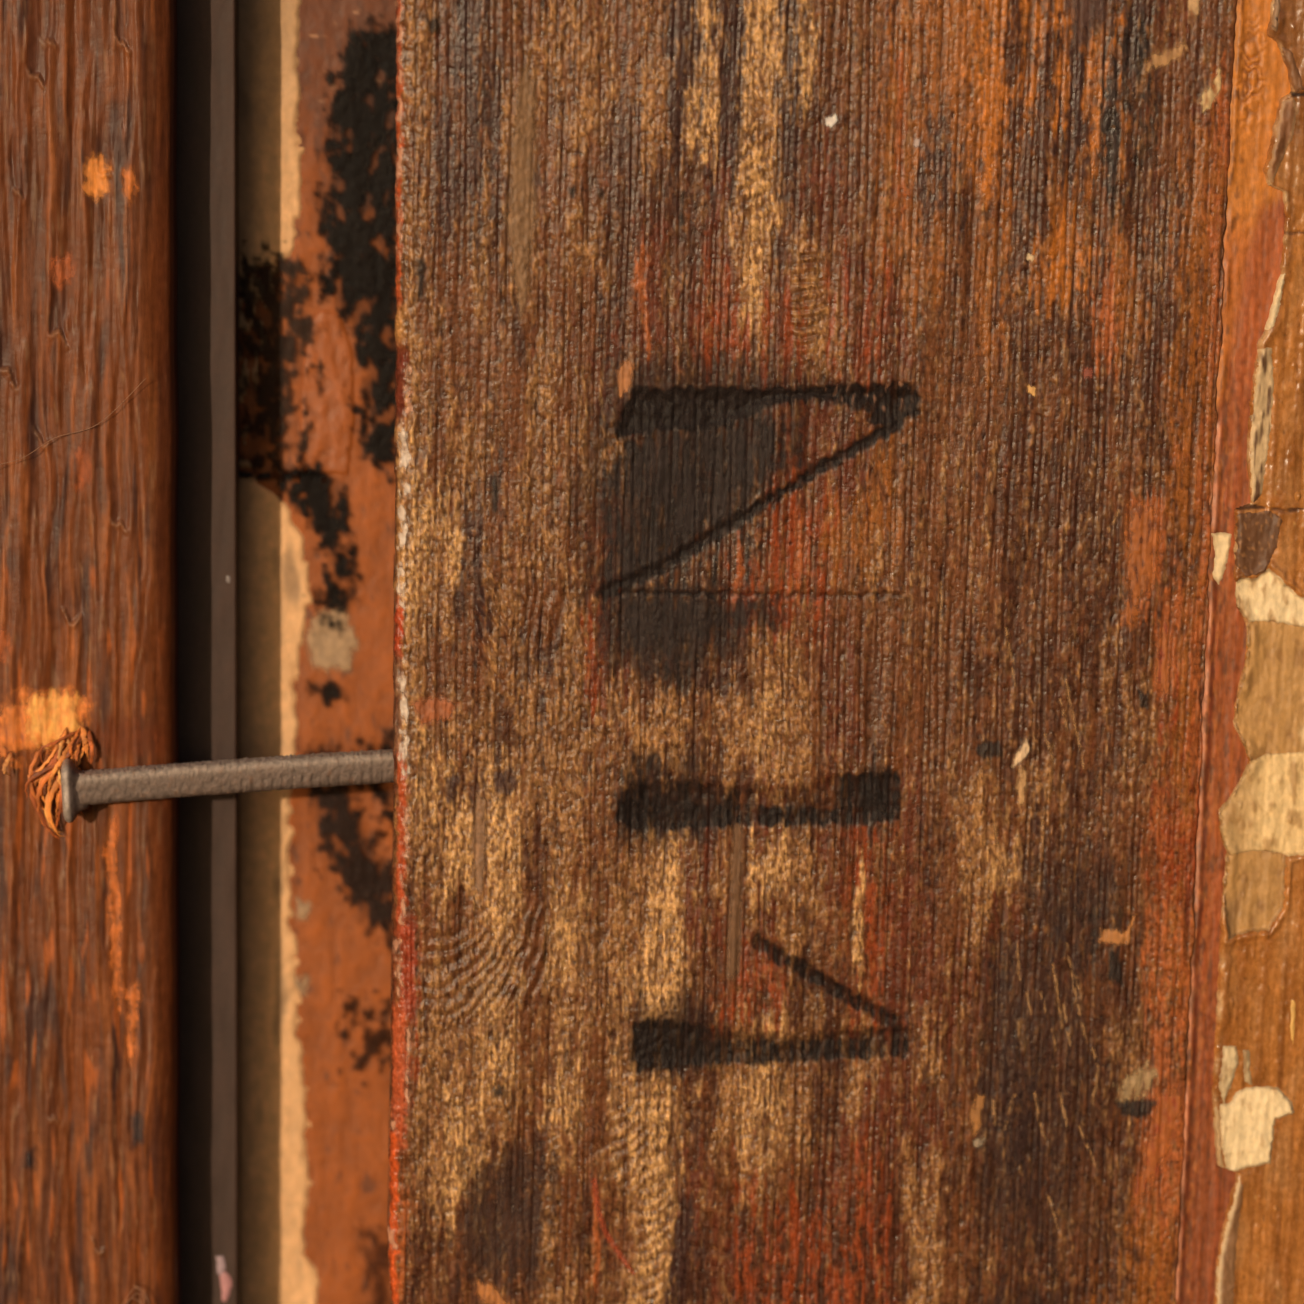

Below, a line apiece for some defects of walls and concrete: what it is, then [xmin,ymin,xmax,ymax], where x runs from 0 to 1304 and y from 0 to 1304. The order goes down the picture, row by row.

peeling [1267,47,1304,182]
water stain [239,15,398,630]
peeling [1265,274,1285,330]
peeling [1211,347,1304,940]
peeling [1213,1046,1294,1304]